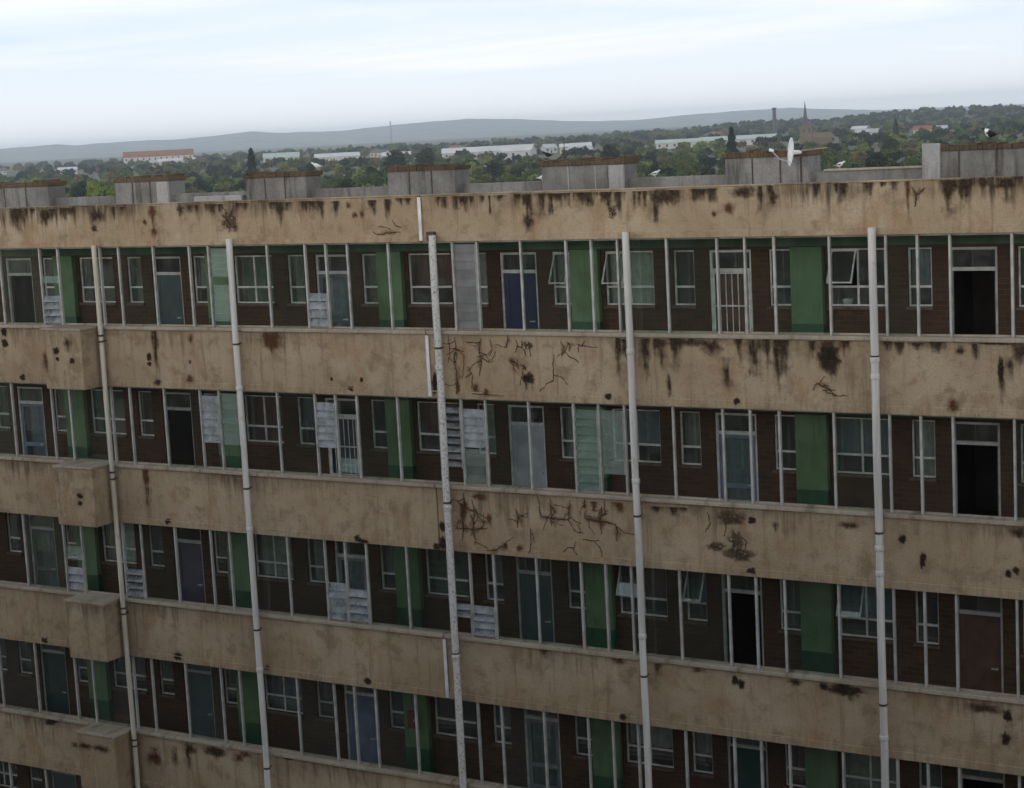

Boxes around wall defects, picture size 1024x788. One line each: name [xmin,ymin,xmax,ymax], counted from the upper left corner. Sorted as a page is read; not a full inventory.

damp [10,208,74,228]
damp [437,192,597,228]
damp [632,188,717,221]
damp [734,185,778,204]
damp [941,178,1014,204]
corrosion [263,333,280,351]
crack [443,335,597,394]
damp [641,338,720,368]
damp [734,339,788,381]
damp [883,342,945,352]
crack [813,376,847,397]
crack [451,493,635,556]